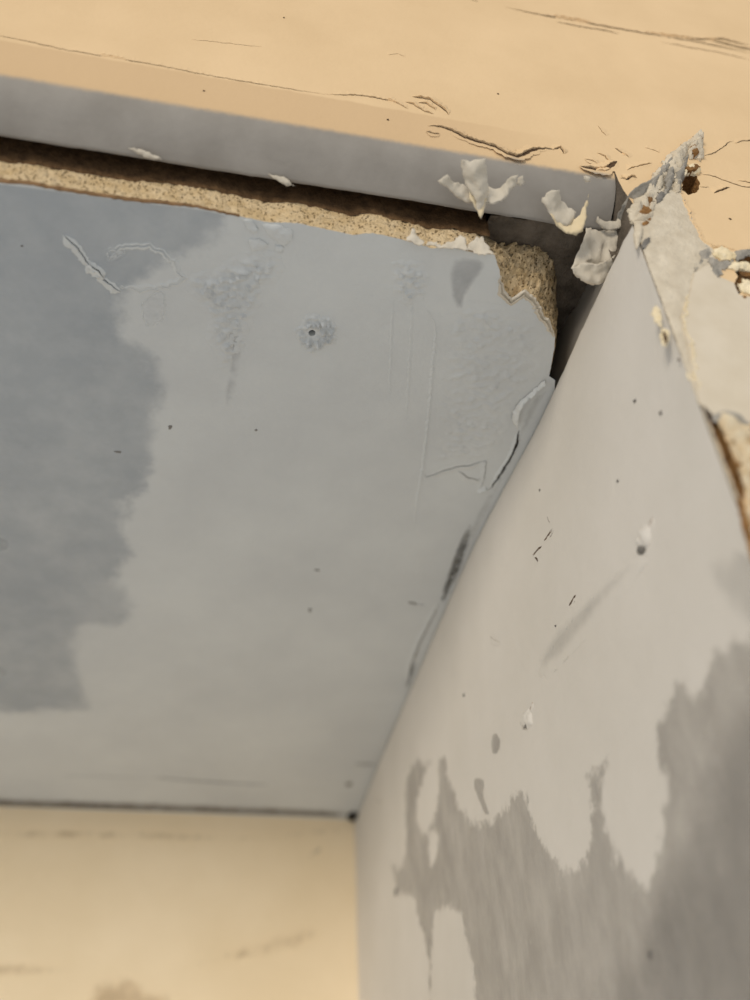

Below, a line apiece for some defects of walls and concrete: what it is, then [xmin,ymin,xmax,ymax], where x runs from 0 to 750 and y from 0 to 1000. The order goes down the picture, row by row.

crack [505,7,750,60]
peeling [128,148,162,160]
peeling [268,173,295,186]
peeling [438,158,524,218]
crack [426,124,660,184]
spalling [685,138,703,176]
crack [700,136,750,195]
spalling [634,177,750,556]
peeling [477,380,546,494]
water stain [442,535,469,599]